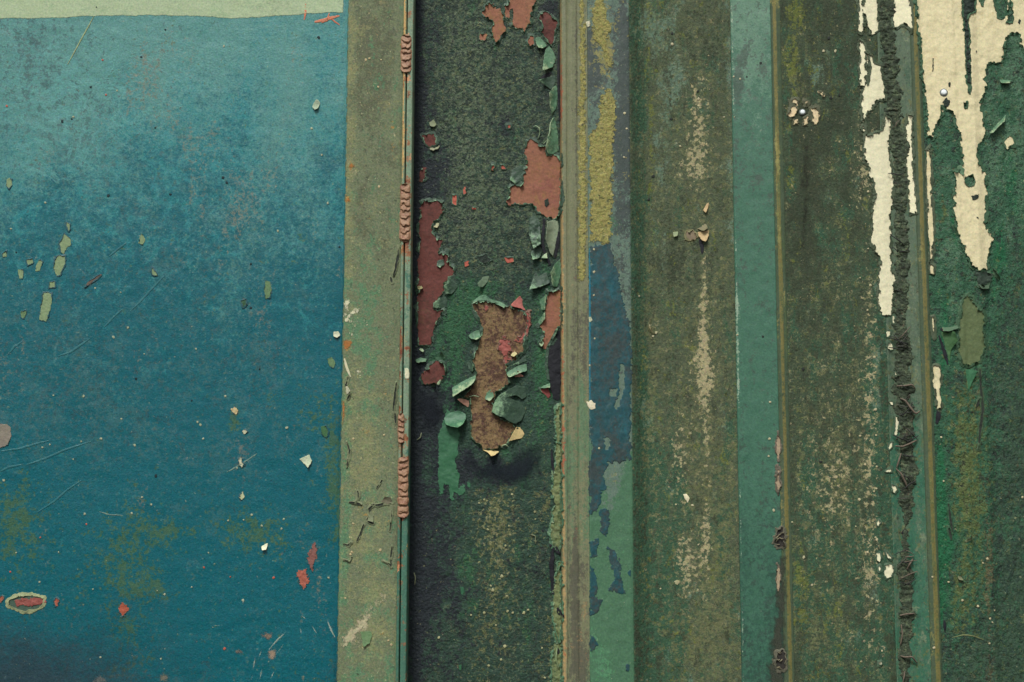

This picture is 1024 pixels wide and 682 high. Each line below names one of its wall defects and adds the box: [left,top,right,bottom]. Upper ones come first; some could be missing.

peeling [786,90,826,127]
peeling [854,0,1024,412]
peeling [18,222,71,322]
peeling [404,0,565,682]
peeling [0,592,60,614]